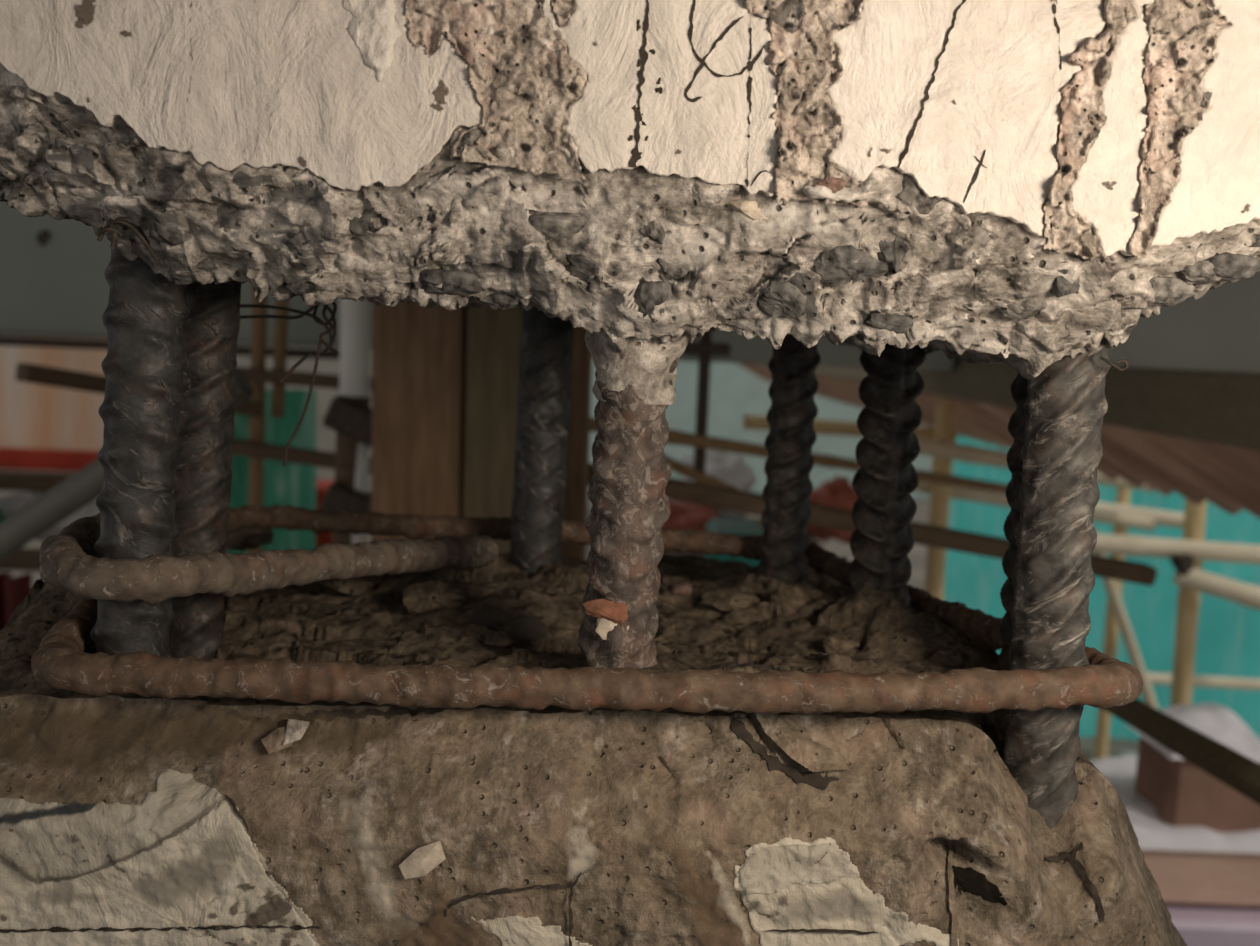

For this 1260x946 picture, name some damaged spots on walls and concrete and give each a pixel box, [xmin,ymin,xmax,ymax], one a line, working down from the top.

crack [628,0,770,187]
crack [898,0,966,168]
spalling [0,0,1260,671]
spalling [1003,705,1084,829]
peeling [0,769,319,946]
crack [0,925,320,933]
peeling [471,916,592,946]
peeling [734,833,1007,946]